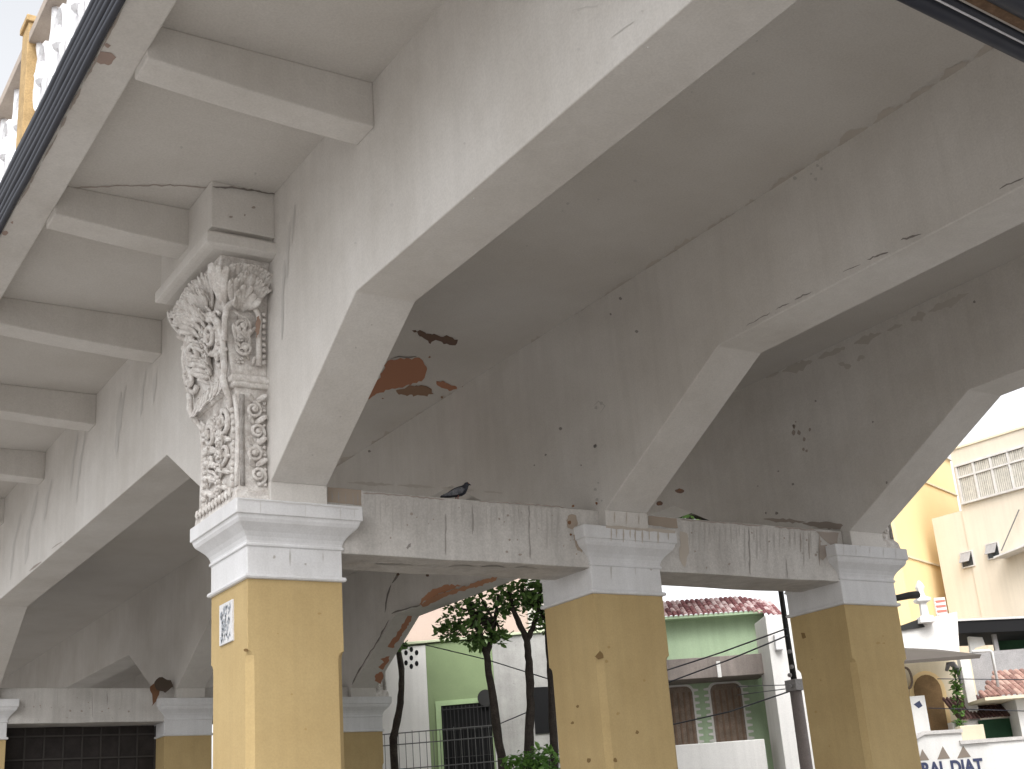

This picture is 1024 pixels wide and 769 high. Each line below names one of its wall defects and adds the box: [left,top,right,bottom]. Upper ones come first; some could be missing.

crack [78,184,274,194]
peeling [368,330,463,399]
damp [332,482,566,571]
spalling [419,577,498,607]
crack [352,575,420,684]
spalling [375,616,412,684]